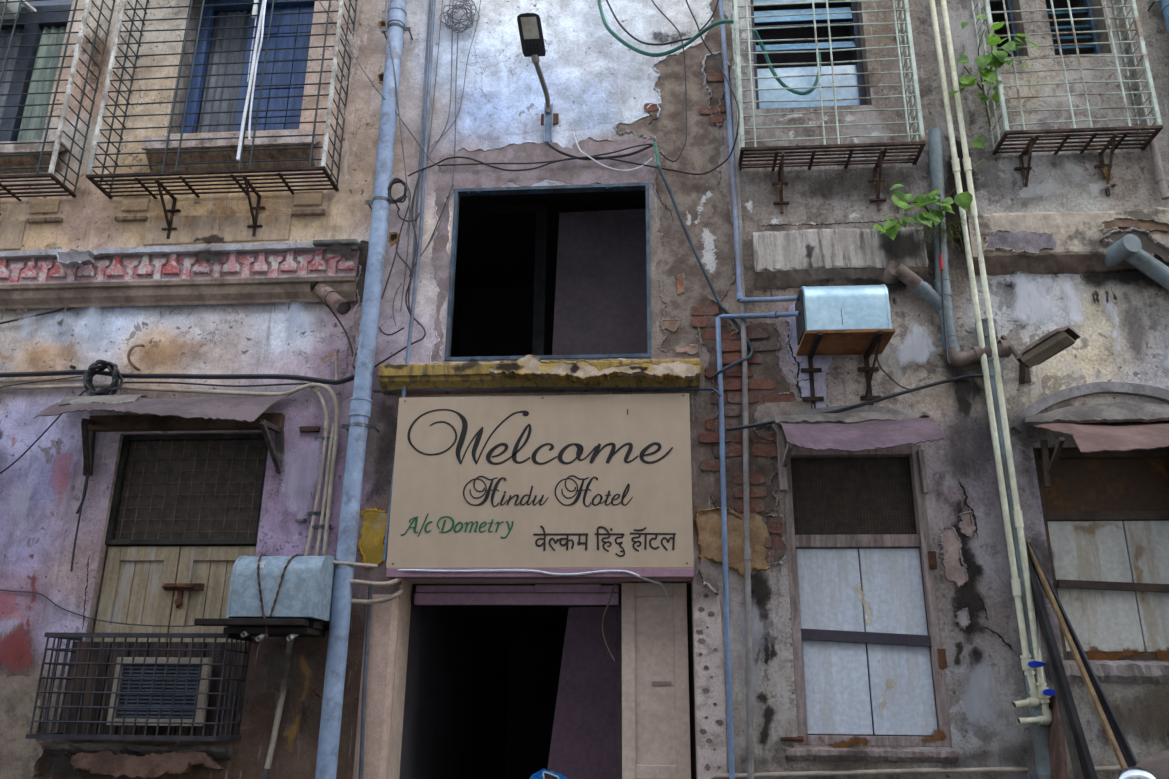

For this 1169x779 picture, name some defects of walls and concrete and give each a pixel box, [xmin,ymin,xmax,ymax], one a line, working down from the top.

spalling [1099,216,1169,265]
spalling [429,0,832,750]
spalling [938,511,976,588]
peeling [0,572,49,779]
spalling [954,608,971,630]
corrosion [1086,643,1169,661]